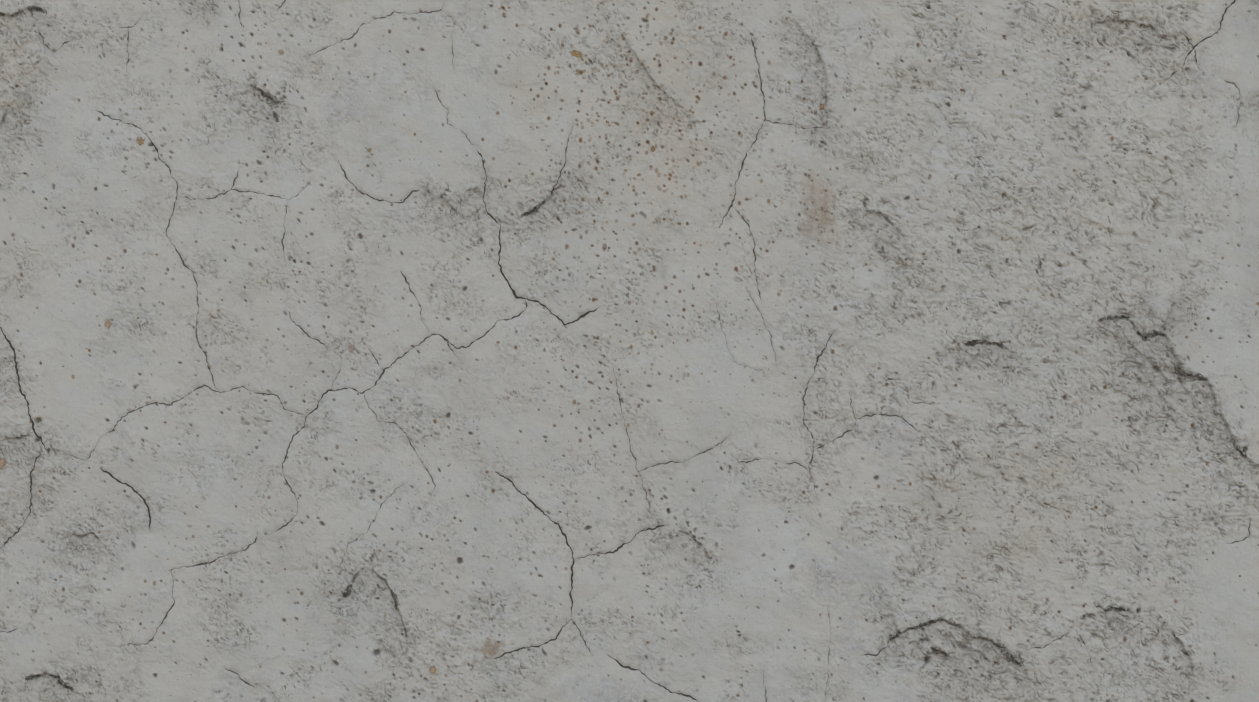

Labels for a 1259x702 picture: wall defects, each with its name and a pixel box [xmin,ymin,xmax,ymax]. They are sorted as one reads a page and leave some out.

crack [322,10,441,50]
crack [721,40,818,298]
crack [0,327,49,545]
crack [89,92,597,567]
crack [495,392,758,700]
crack [789,334,914,470]